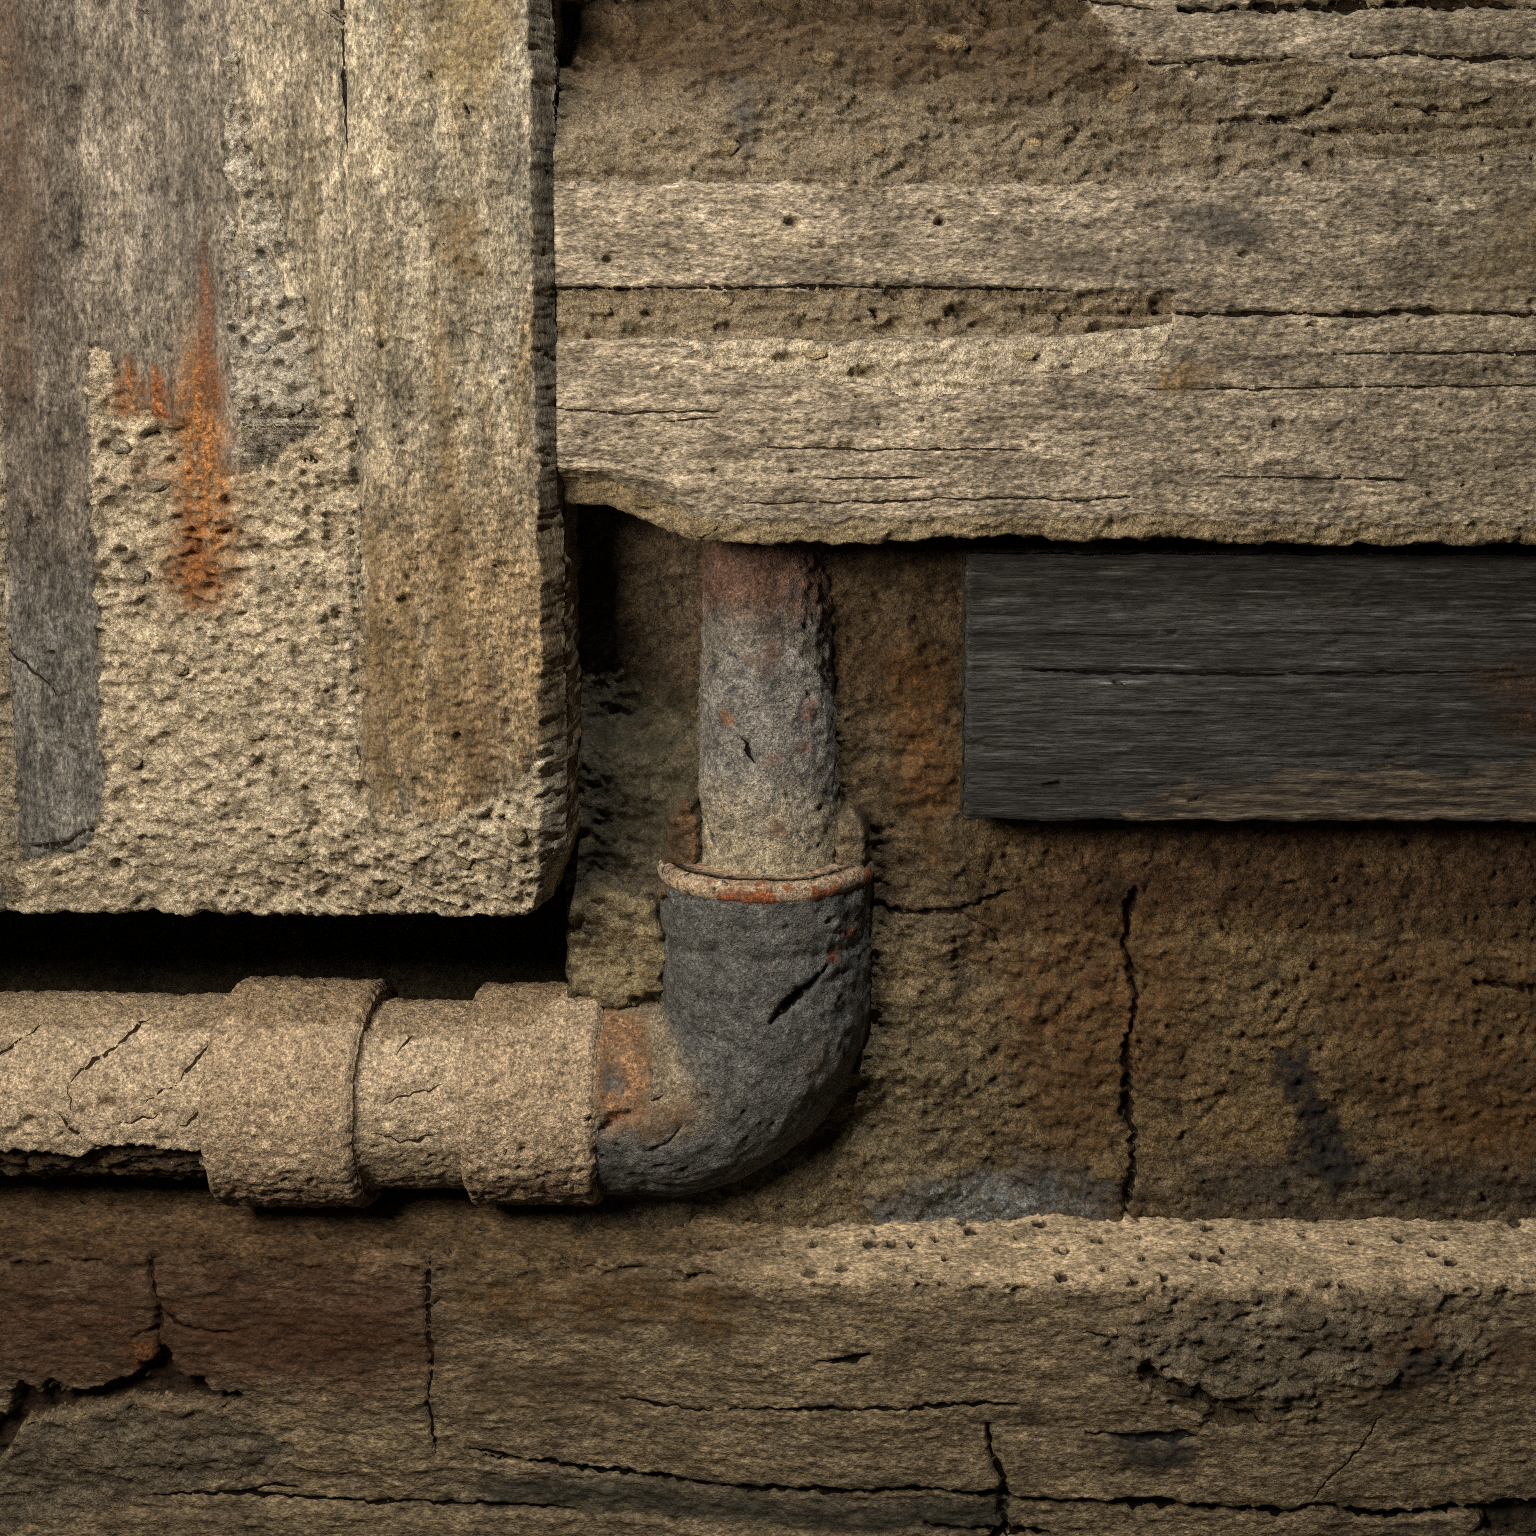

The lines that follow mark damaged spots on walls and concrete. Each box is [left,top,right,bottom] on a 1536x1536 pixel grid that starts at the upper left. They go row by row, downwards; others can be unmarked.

rust [115,245,235,606]
crack [1118,888,1145,1210]
crack [132,1258,229,1354]
crack [161,1482,569,1508]
crack [424,1255,1536,1536]